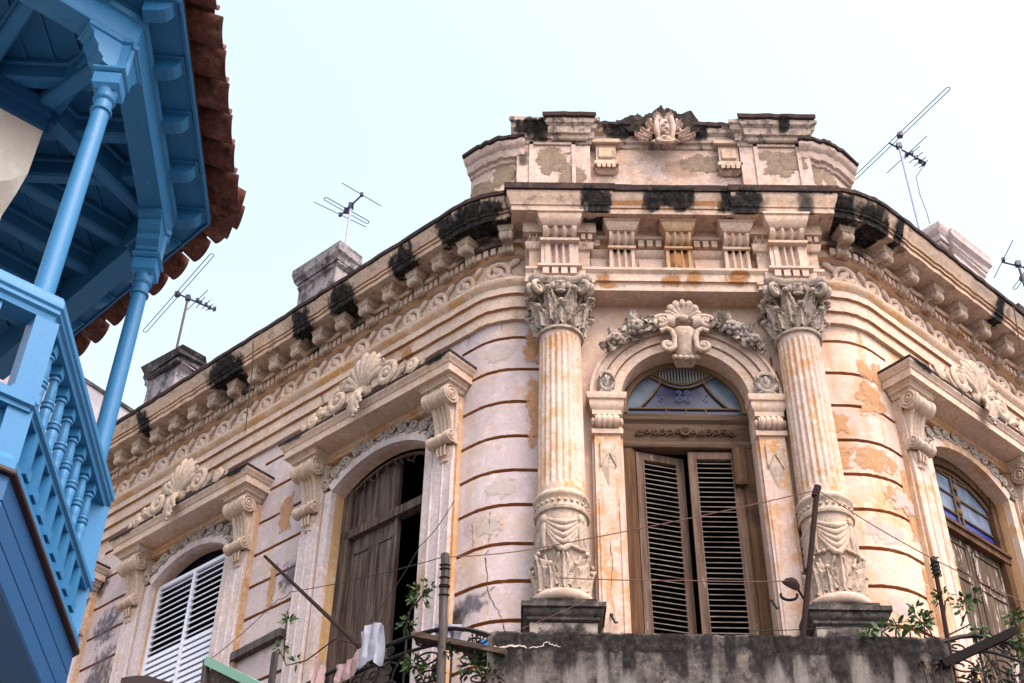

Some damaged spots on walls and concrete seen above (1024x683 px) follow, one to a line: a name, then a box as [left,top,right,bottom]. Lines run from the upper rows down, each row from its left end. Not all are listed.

water stain [515,116,549,141]
spalling [535,146,587,183]
spalling [758,150,838,185]
water stain [434,198,511,264]
water stain [642,185,696,223]
water stain [714,186,763,223]
water stain [798,190,906,258]
water stain [209,352,252,405]
peeling [855,360,887,417]
peeling [832,411,921,546]
crack [471,512,560,648]
peeling [889,595,912,616]